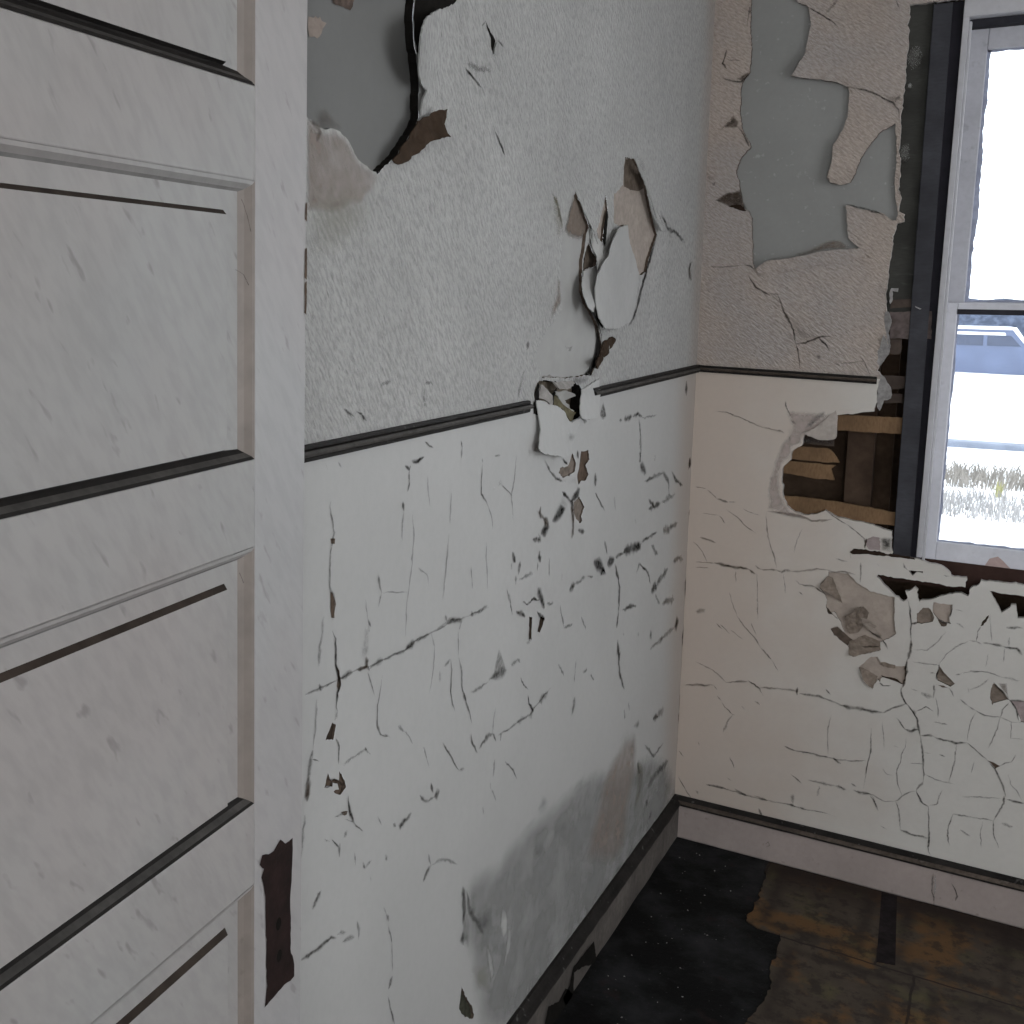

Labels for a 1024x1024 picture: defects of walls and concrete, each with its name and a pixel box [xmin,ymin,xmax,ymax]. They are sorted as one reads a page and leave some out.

peeling [305,0,456,221]
peeling [718,0,898,278]
peeling [533,157,681,541]
crack [726,265,829,364]
peeling [260,838,294,1007]
crack [341,800,359,828]
crack [305,515,544,798]
crack [510,590,584,626]
water stain [462,745,668,1015]
flaking render [820,572,906,688]
crack [796,608,1021,851]
flaking render [913,602,953,627]